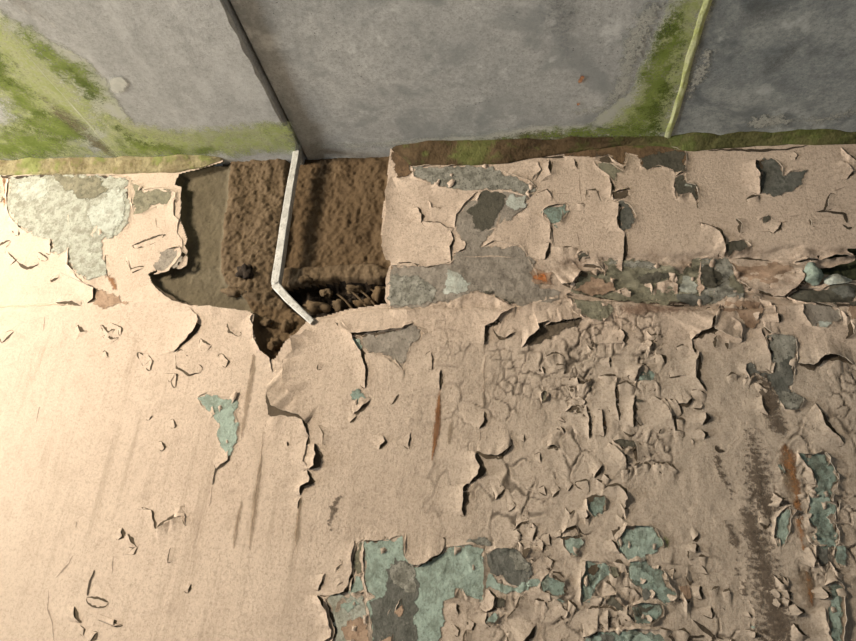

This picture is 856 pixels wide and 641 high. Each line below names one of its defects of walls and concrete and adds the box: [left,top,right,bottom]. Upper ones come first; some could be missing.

water stain [0,19,295,160]
water stain [494,0,717,140]
flaking render [0,146,856,641]
corrosion [431,394,441,459]
corrosion [781,444,804,550]